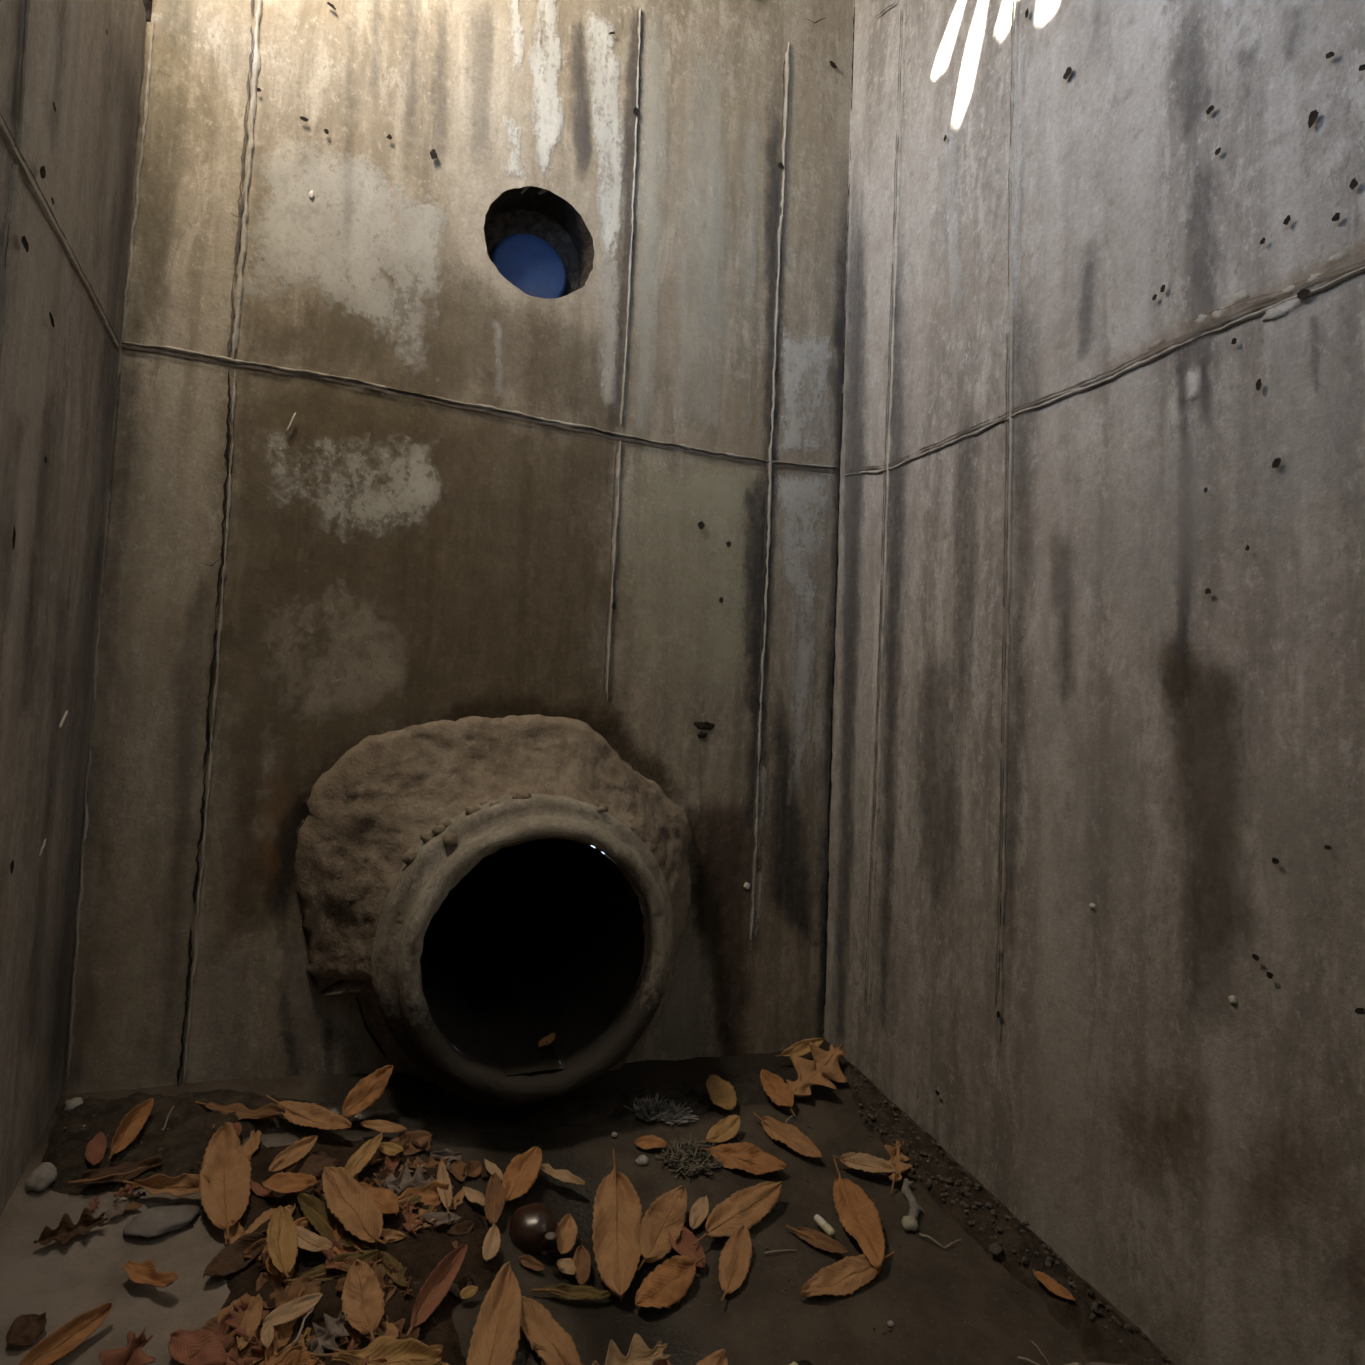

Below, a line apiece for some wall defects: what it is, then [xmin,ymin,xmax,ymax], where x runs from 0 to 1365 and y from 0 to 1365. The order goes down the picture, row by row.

damp [503,0,666,425]
damp [635,126,863,1048]
damp [869,299,903,923]
damp [1166,342,1238,952]